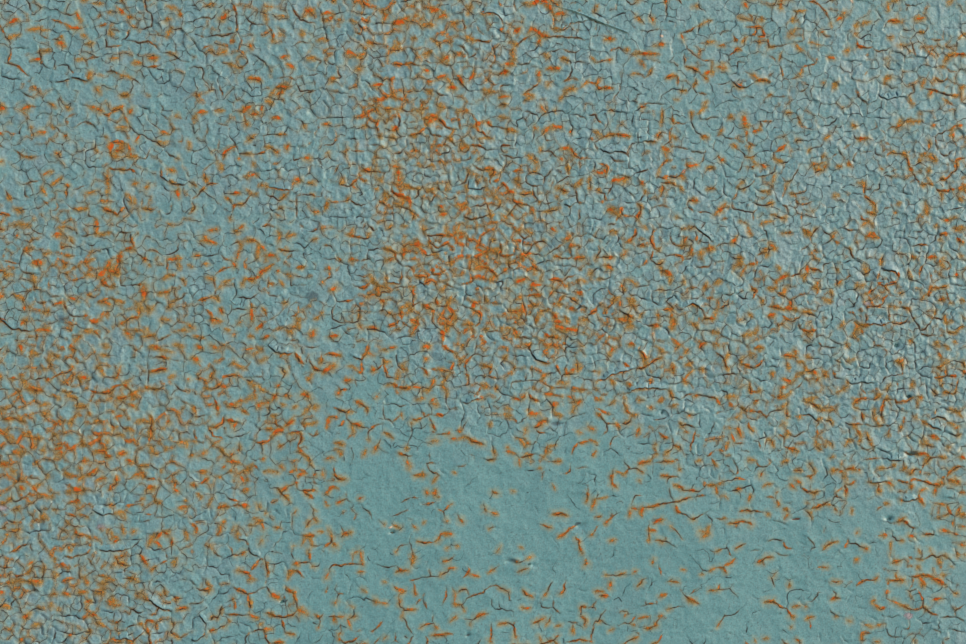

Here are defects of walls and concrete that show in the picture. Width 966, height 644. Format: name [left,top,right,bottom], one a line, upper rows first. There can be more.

crack [0,114,41,199]
corrosion [91,93,140,159]
corrosion [887,142,966,201]
corrosion [282,0,642,474]
corrosion [624,279,730,397]
corrosion [0,207,368,644]
corrosion [846,359,966,556]
crack [395,599,452,644]
crack [384,533,469,581]
crack [547,468,638,551]
crack [443,544,744,644]
crack [720,539,818,643]